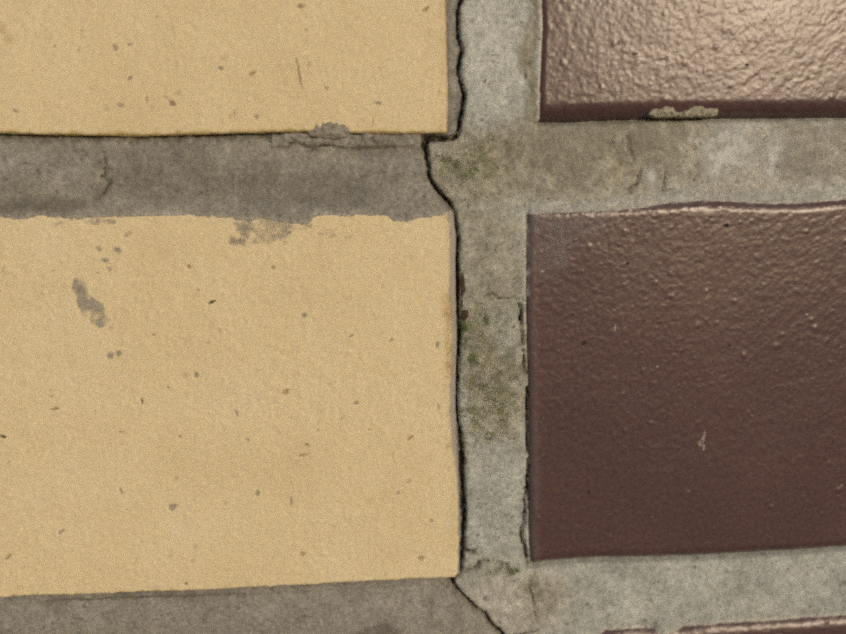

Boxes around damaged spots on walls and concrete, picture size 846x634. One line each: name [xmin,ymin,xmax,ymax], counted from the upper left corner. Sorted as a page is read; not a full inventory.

crack [422,0,537,634]
damp [527,191,771,212]